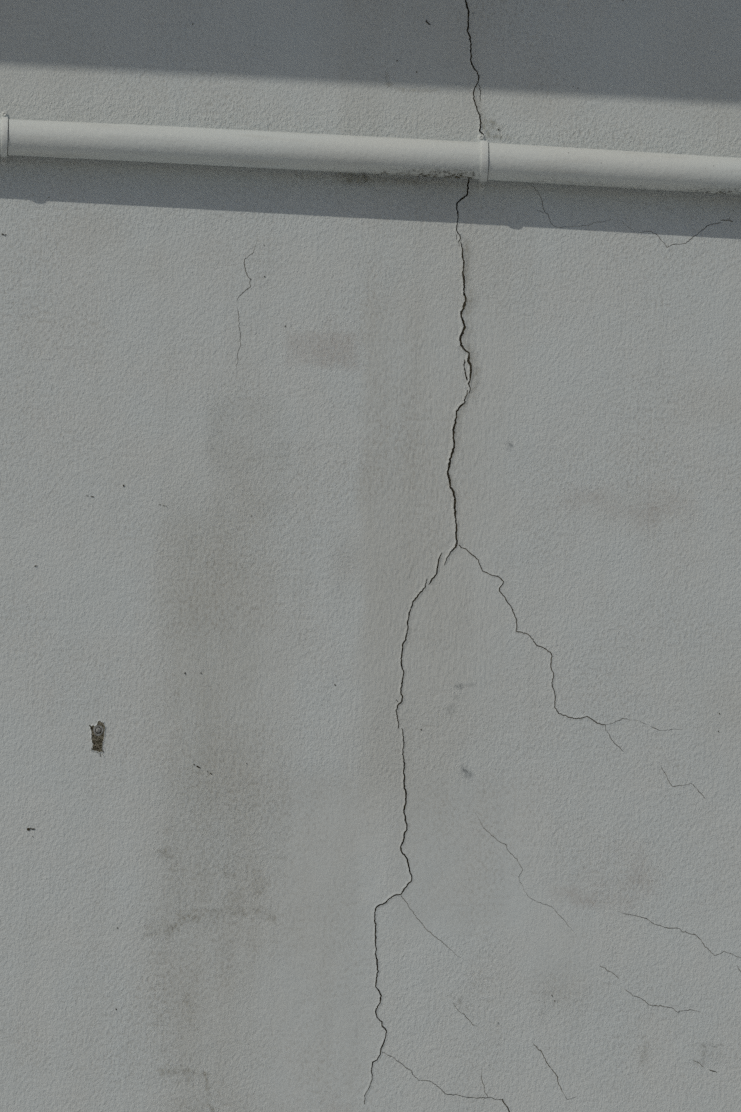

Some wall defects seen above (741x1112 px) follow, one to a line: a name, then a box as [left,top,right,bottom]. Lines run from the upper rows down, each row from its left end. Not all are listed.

crack [462,0,487,141]
crack [528,183,734,247]
crack [362,179,687,1112]
spalling [89,719,106,755]
crack [618,911,741,972]